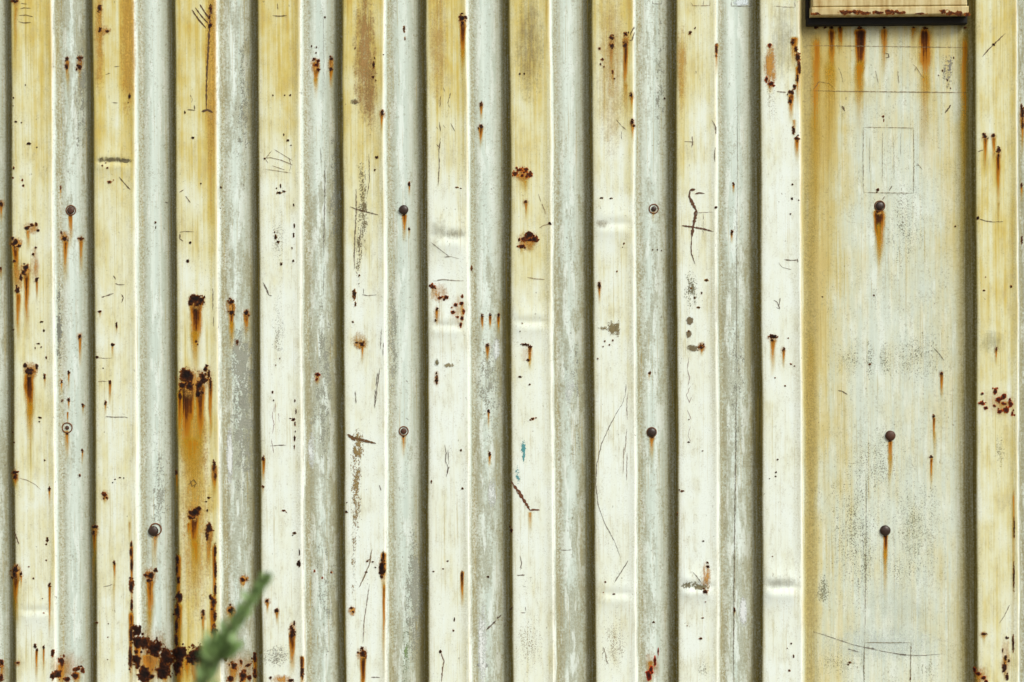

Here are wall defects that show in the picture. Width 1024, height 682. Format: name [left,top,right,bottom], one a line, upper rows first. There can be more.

rust [458,13,468,58]
rust [811,9,971,133]
rust [517,231,540,249]
rust [874,209,885,251]
rust [0,222,40,326]
rust [188,294,205,347]
rust [23,356,47,423]
rust [175,364,212,464]
rust [978,387,1015,416]
rust [187,506,235,638]
rust [128,541,202,682]
rust [33,643,85,682]